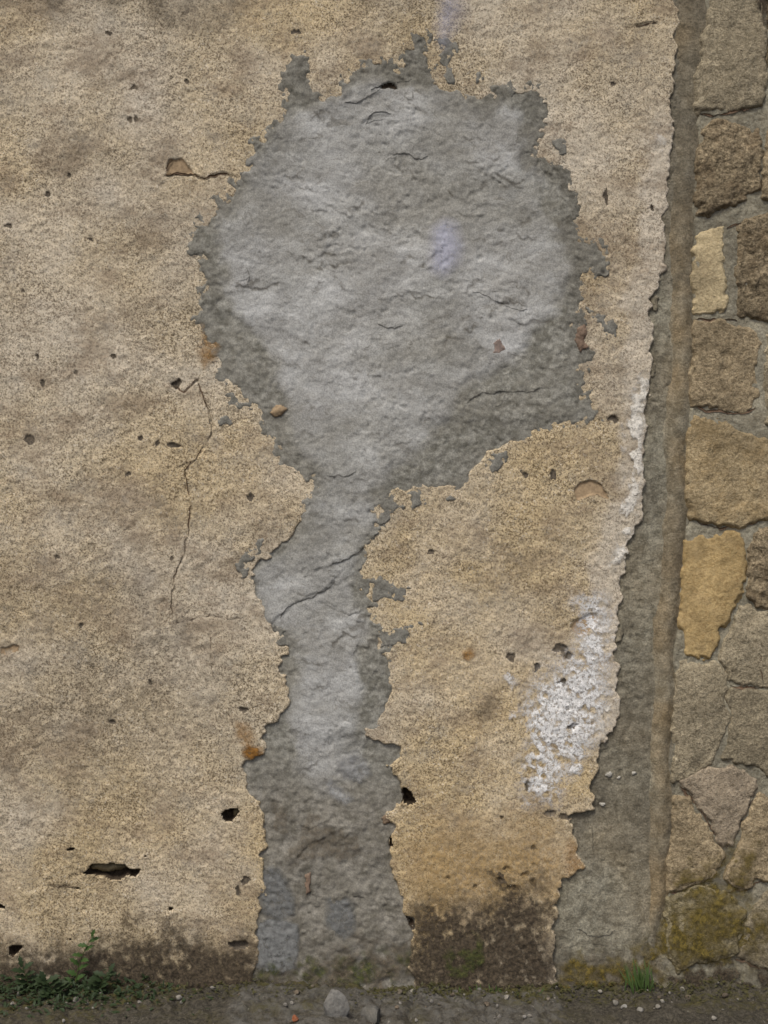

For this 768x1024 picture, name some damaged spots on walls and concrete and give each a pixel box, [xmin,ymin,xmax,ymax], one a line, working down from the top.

crack [170,379,219,669]
spalling [184,29,681,991]
leakage [511,596,611,801]
leakage [0,871,623,992]